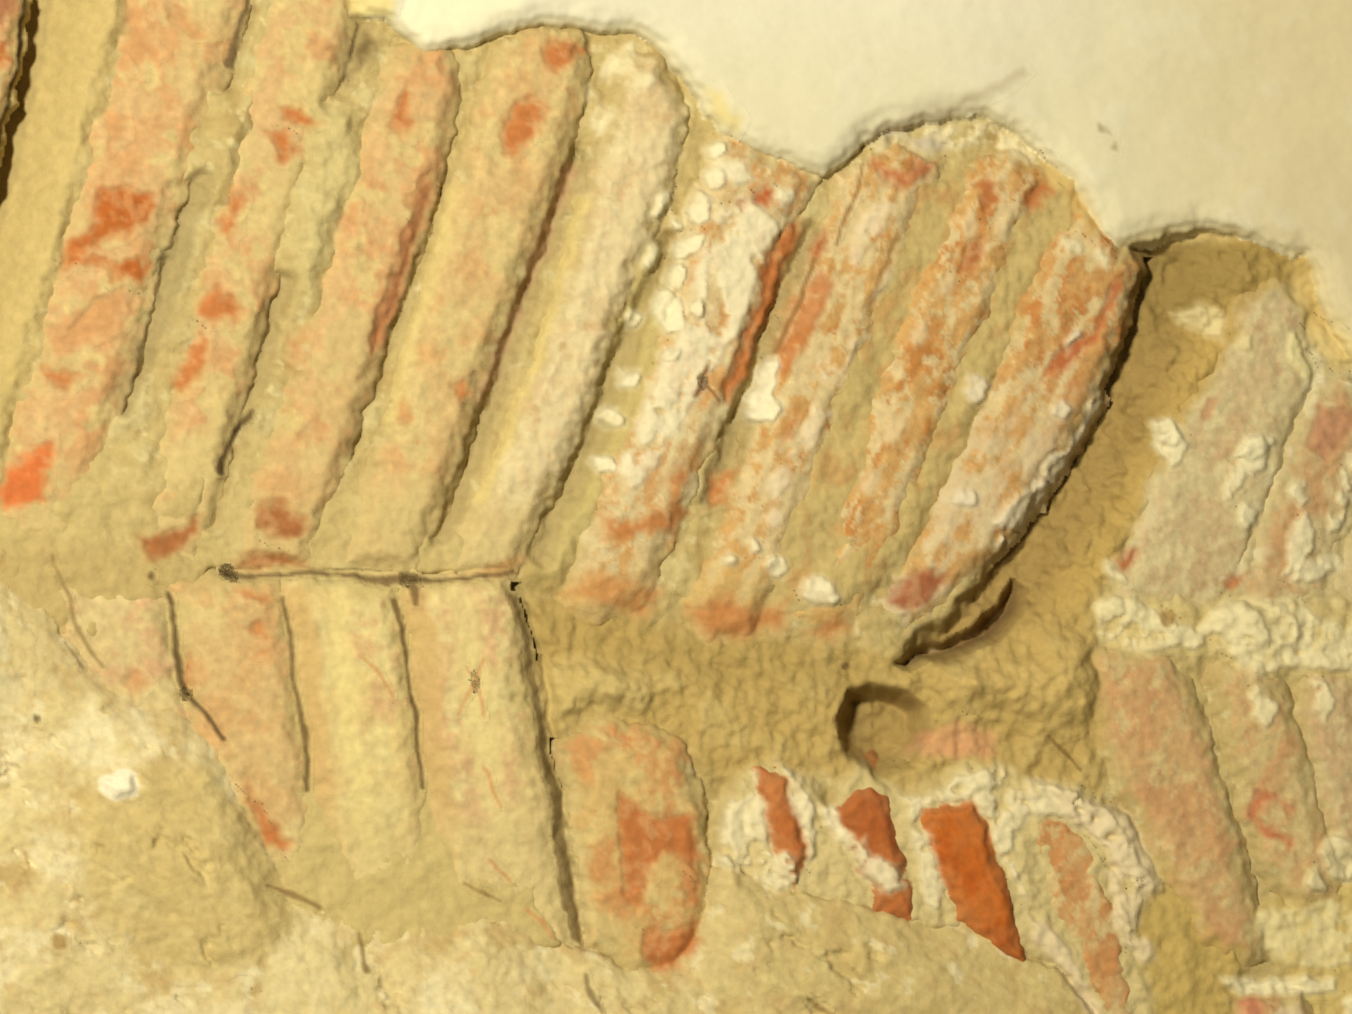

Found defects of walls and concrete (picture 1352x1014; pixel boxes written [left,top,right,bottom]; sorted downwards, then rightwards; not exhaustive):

flaking render [0,0,520,636]
flaking render [404,30,1352,1014]
spalling [27,708,47,730]
spalling [180,645,201,704]
crack [161,587,230,745]
spalling [225,580,279,664]
flaking render [234,776,562,948]
crack [216,561,606,1014]
spalling [44,929,71,956]